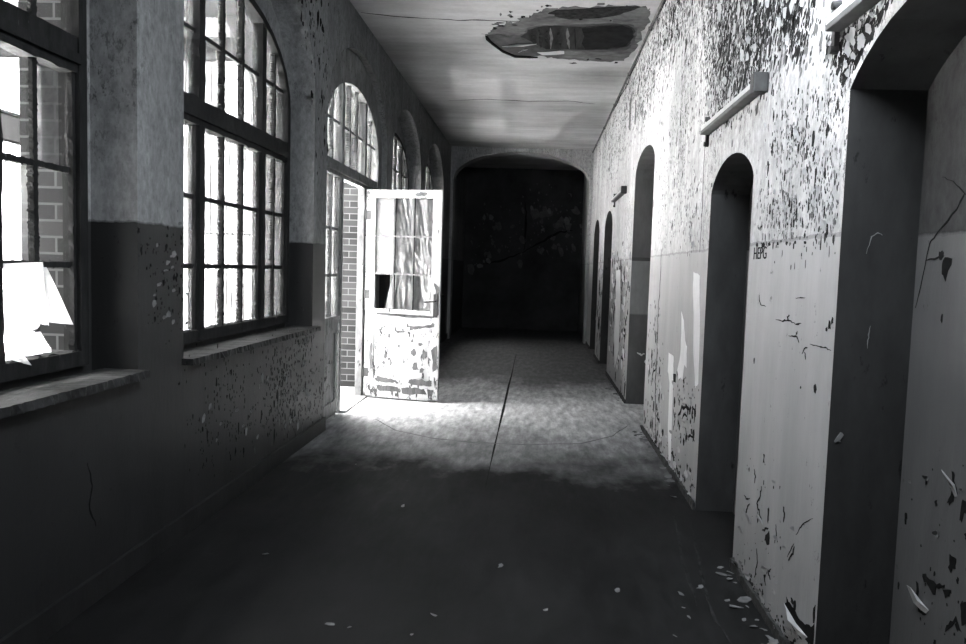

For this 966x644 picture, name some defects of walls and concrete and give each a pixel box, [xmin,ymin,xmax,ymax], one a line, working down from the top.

peeling [485,0,893,270]
peeling [644,301,699,495]
peeling [732,454,816,644]
peeling [897,554,966,644]
peeling [922,465,966,522]